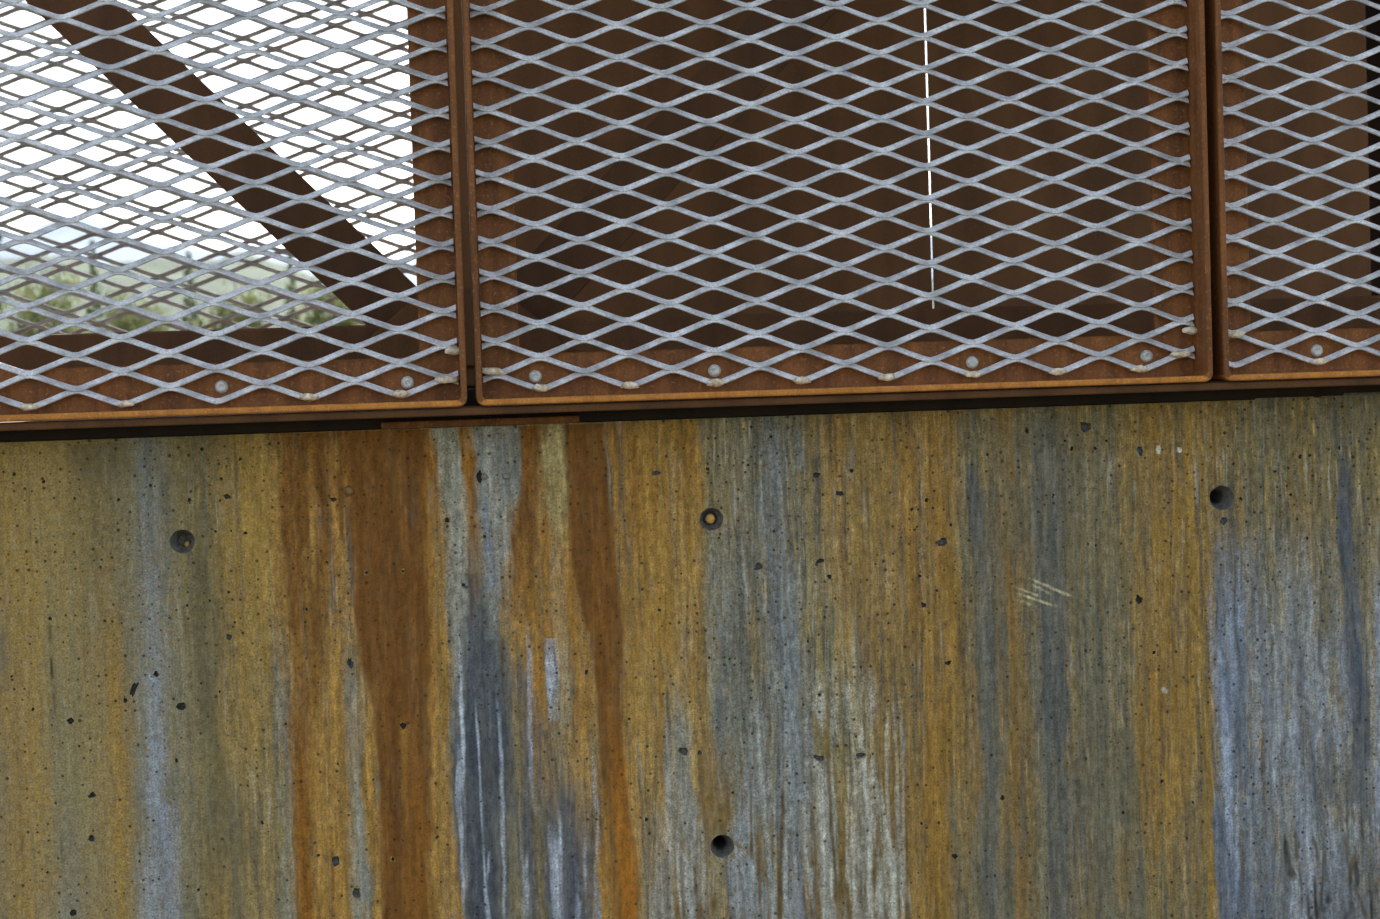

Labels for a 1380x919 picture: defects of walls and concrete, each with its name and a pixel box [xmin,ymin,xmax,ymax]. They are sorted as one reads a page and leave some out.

rust [99,597,140,919]
leakage [434,425,599,919]
rust [227,413,976,919]
leakage [934,394,1380,919]
rust [1111,405,1220,919]